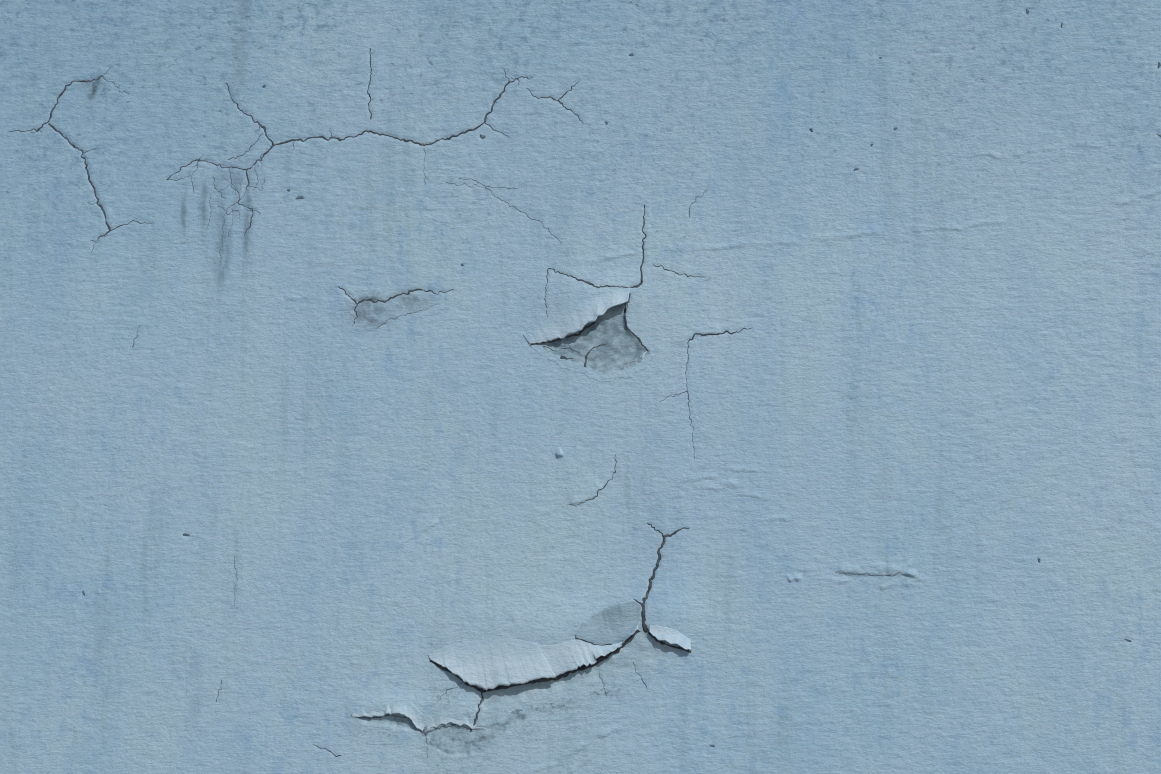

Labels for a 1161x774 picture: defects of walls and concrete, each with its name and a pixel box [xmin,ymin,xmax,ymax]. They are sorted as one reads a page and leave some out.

crack [8,66,146,253]
crack [167,48,584,263]
peeling [523,204,656,381]
crack [660,327,753,457]
peeling [348,523,692,770]